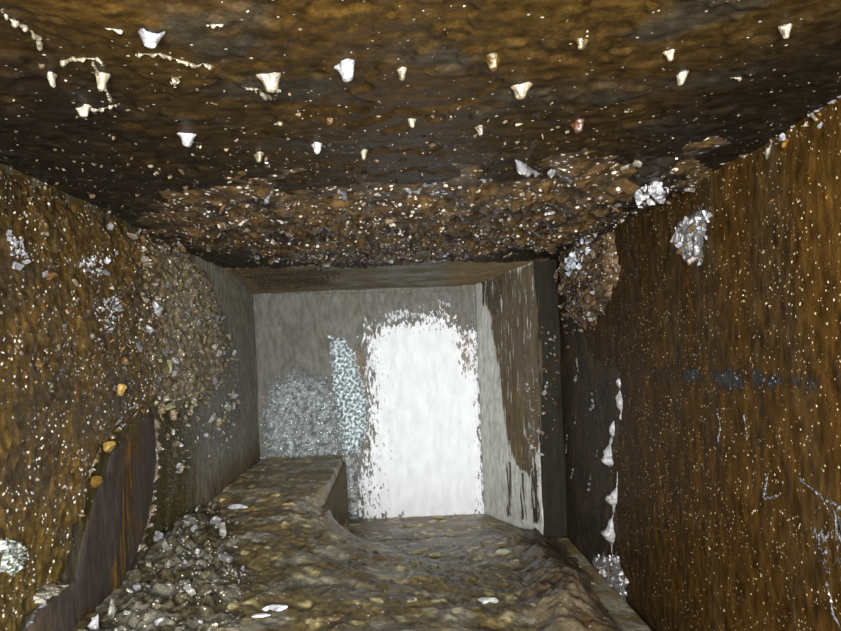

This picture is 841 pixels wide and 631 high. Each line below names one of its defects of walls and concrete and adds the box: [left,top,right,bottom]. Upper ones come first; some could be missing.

crack [739,96,841,160]
spalling [619,155,686,208]
damp [0,136,731,631]
spalling [24,412,165,631]
damp [812,499,841,580]